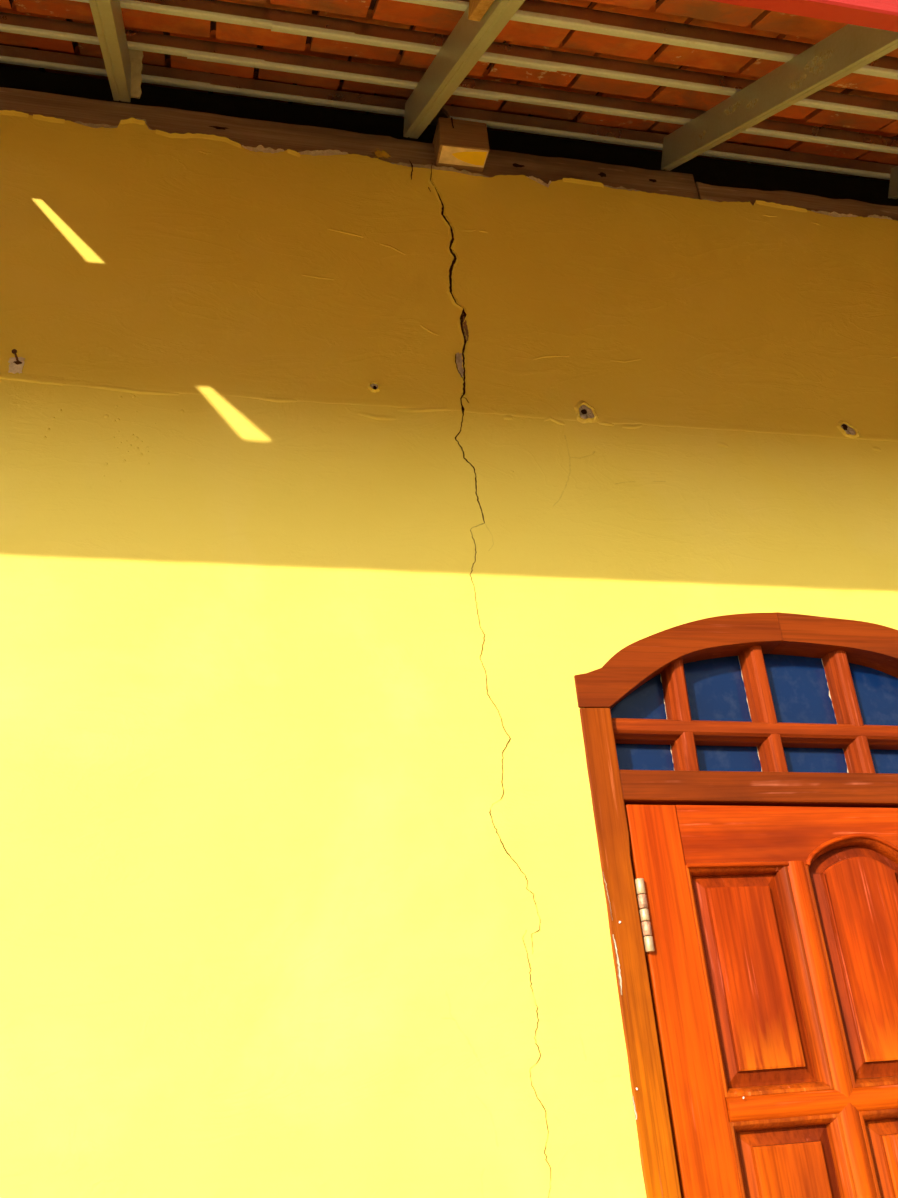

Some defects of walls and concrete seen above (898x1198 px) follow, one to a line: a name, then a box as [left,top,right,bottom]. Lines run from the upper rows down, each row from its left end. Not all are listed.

spalling [0,110,348,157]
peeling [526,176,640,191]
peeling [756,200,892,220]
crack [409,160,551,1198]